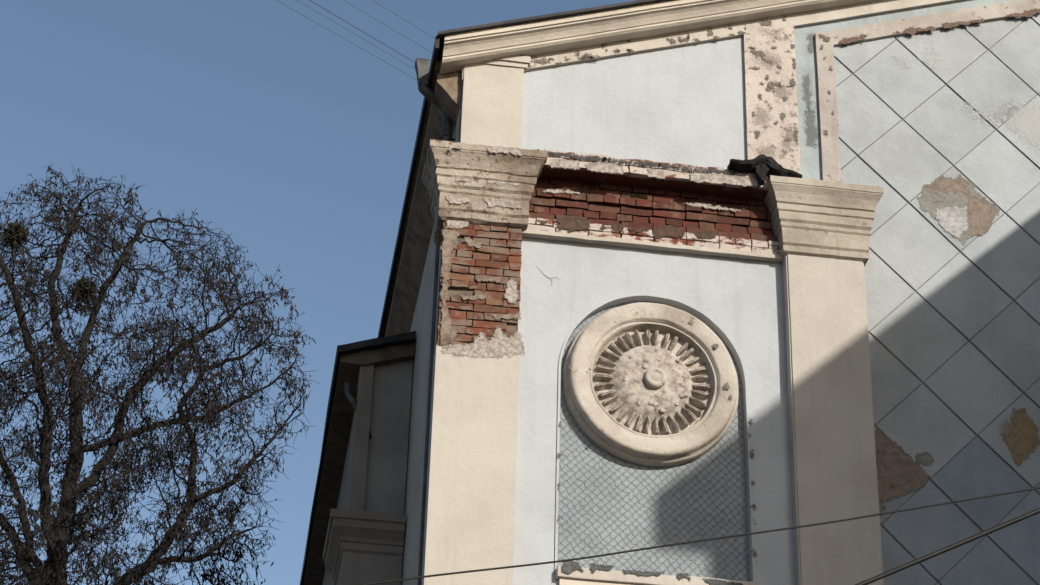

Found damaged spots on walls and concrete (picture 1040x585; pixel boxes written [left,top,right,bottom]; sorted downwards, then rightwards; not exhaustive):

peeling [528,40,634,68]
peeling [819,34,867,70]
peeling [893,17,984,35]
peeling [1007,8,1040,18]
peeling [748,44,799,143]
flaking render [917,174,1000,245]
flaking render [436,146,780,358]
flaking render [1000,408,1040,466]
flaking render [875,429,934,516]
peeling [561,559,746,585]